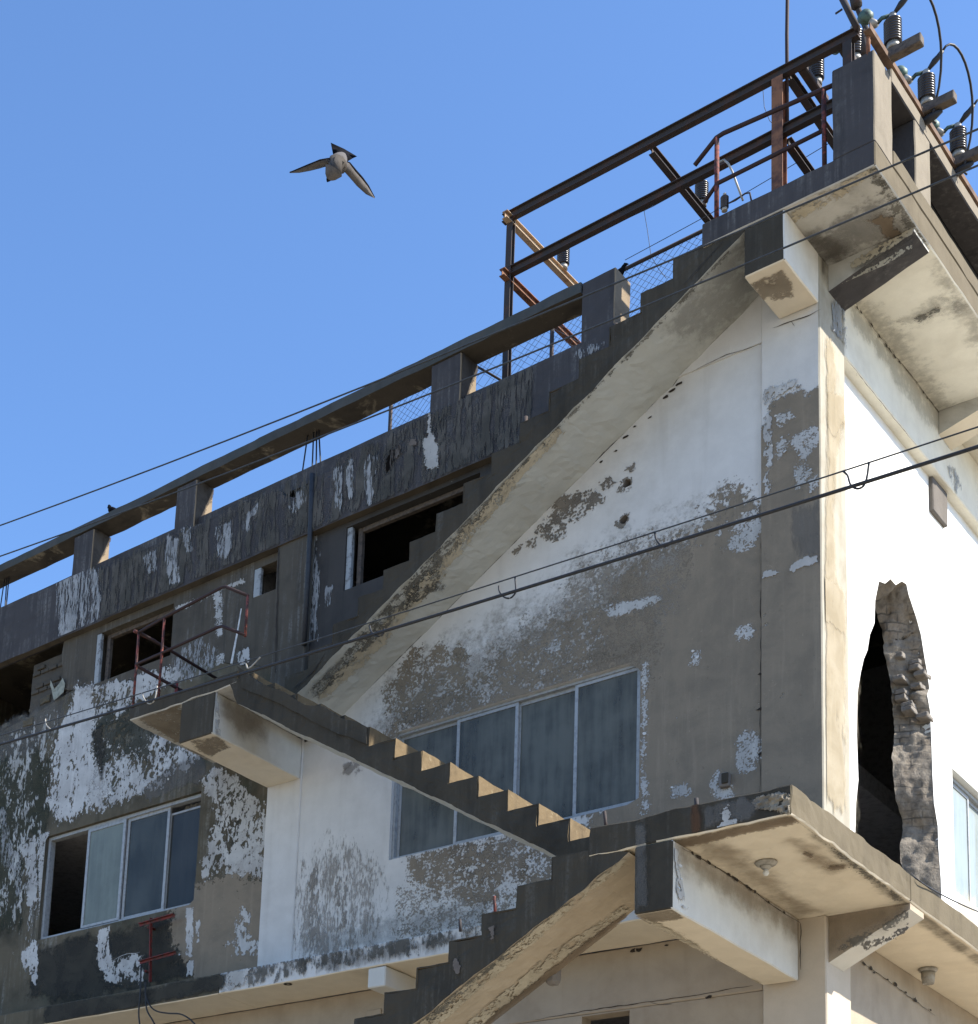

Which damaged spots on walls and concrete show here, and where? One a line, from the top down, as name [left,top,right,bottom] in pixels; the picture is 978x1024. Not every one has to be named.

spalling [302,430,321,470]
peeling [381,380,823,830]
water stain [675,816,799,847]
peeling [165,867,262,978]
water stain [30,839,482,1023]
peeling [392,835,552,940]
peeling [420,858,629,1024]
water stain [825,842,908,952]
peeling [861,922,909,951]